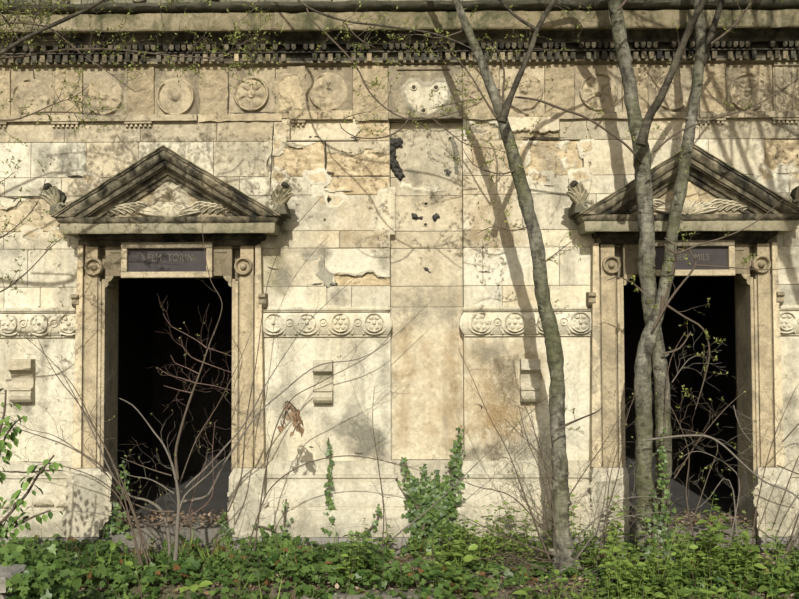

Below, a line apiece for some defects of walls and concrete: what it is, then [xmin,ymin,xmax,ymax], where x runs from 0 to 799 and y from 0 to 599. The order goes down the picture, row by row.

spalling [272,69,309,115]
spalling [399,78,453,117]
spalling [463,118,502,140]
spalling [267,119,395,234]
spalling [508,117,596,186]
spalling [754,140,799,184]
spalling [302,248,390,288]